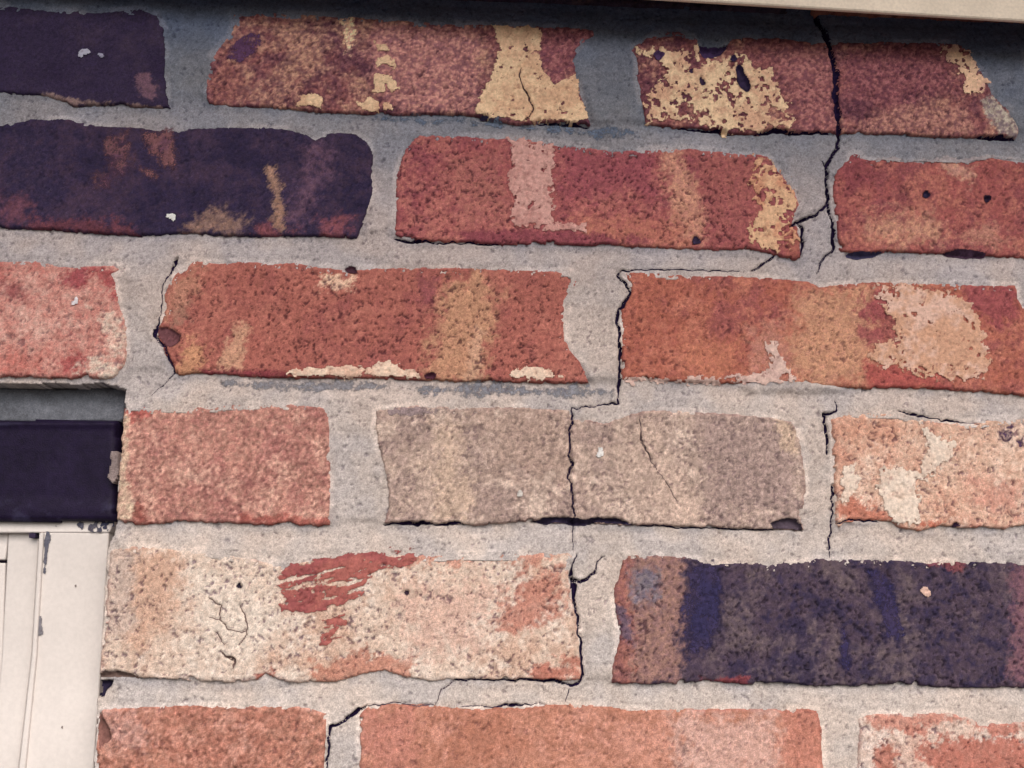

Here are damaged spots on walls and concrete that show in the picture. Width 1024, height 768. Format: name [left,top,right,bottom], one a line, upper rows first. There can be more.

peeling [296,93,323,109]
peeling [356,40,400,114]
peeling [475,24,588,127]
peeling [635,44,796,138]
crack [754,16,842,272]
peeling [747,153,800,254]
crack [152,260,178,395]
peeling [867,281,993,382]
crack [822,401,837,455]
crack [325,256,774,768]